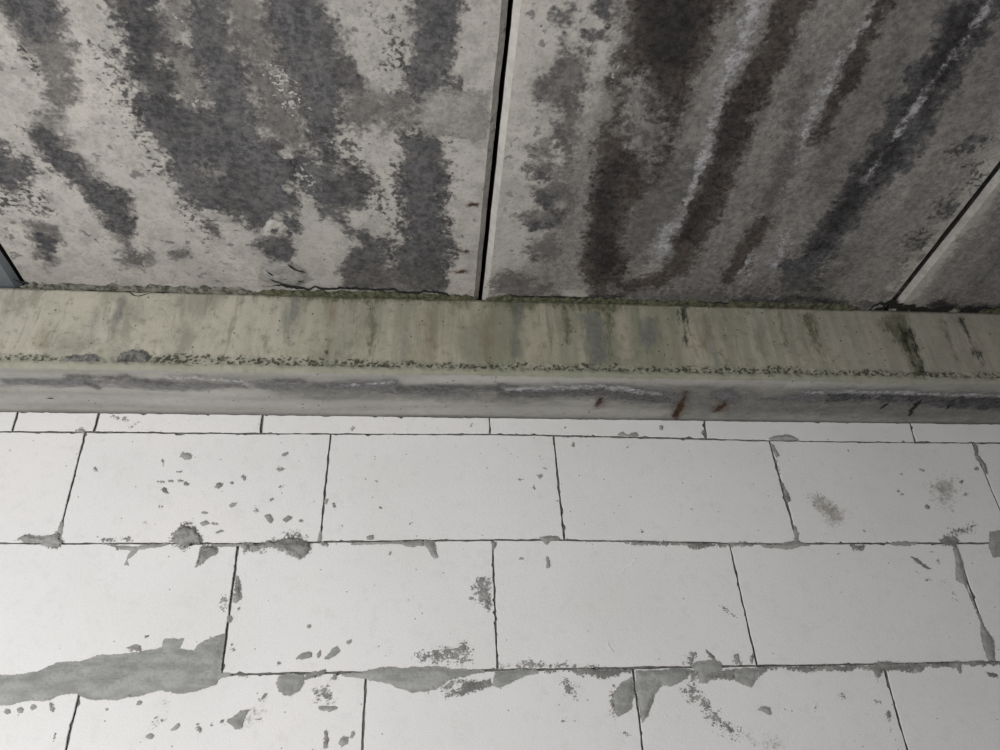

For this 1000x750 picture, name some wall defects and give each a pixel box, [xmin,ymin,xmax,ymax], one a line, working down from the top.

leakage [0,0,154,267]
leakage [94,0,470,295]
leakage [485,0,1000,310]
crack [263,284,449,296]
leakage [897,324,925,374]
rust [671,392,687,420]
peeling [180,511,250,568]
peeling [251,507,309,539]
peeling [304,669,337,712]
peeling [683,649,754,684]